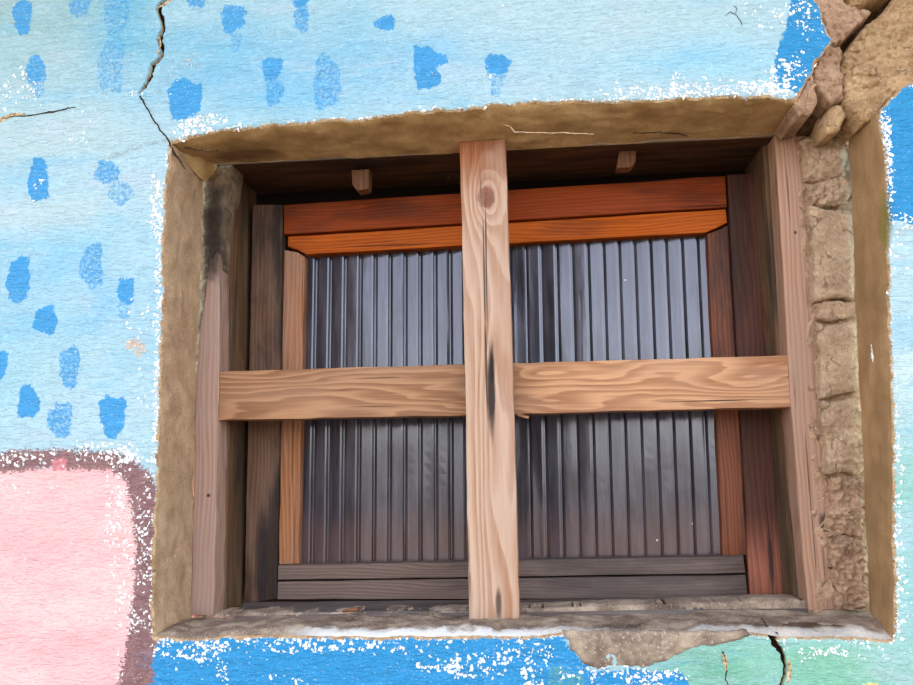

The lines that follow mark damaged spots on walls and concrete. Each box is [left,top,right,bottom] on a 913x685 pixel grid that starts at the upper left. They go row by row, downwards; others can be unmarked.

crack [139,0,171,147]
crack [0,107,75,122]
spalling [664,0,913,613]
peeling [562,628,751,685]
crack [721,651,729,685]
crack [760,618,792,685]